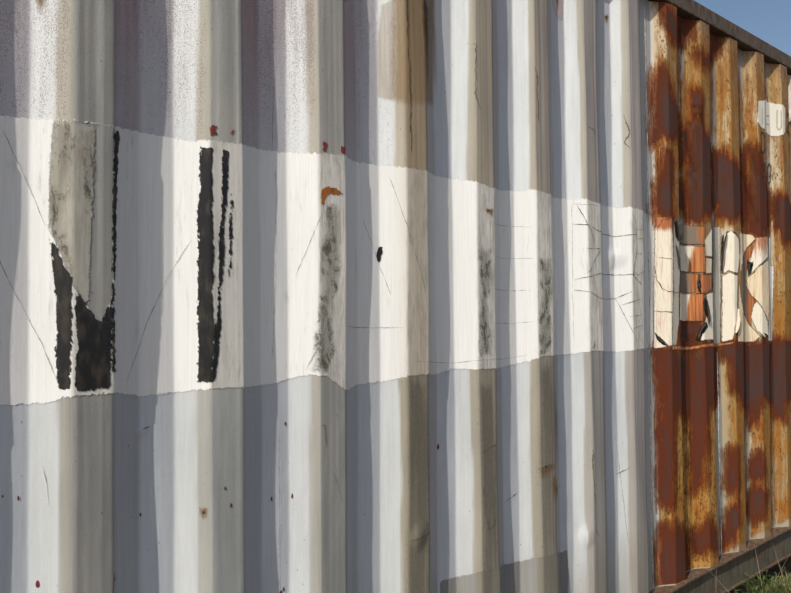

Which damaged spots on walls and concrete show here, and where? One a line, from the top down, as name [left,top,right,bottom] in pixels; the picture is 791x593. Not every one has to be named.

crack [405,1,413,153]
leakage [315,206,339,371]
leakage [480,254,490,352]
leakage [540,260,551,353]
crack [571,204,722,342]
corrosion [645,2,791,588]
crack [741,240,767,339]